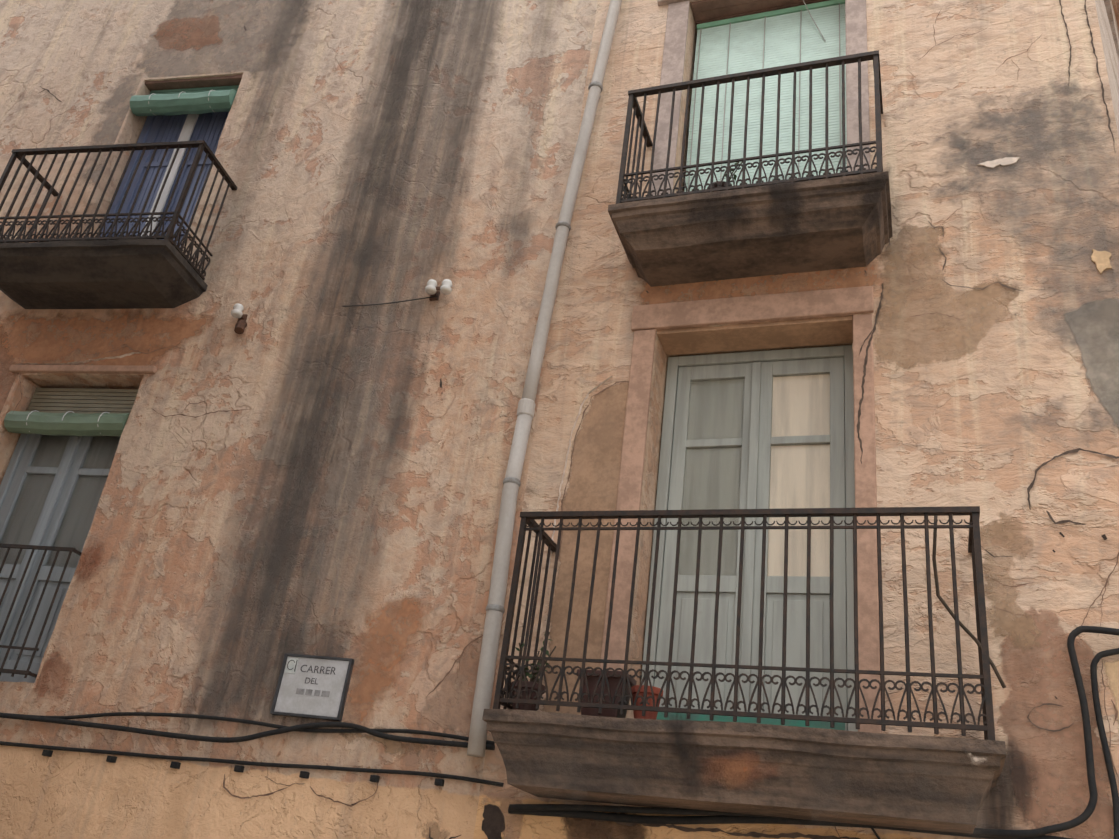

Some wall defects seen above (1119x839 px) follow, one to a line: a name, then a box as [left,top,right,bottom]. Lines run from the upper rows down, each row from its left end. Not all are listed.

crack [996,0,1119,154]
damp [975,110,1053,173]
peeling [640,221,1023,369]
damp [1049,227,1119,313]
peeling [0,344,22,414]
damp [200,0,484,716]
crack [857,284,883,464]
peeling [980,513,1023,557]
crack [1081,552,1119,635]
peeling [986,573,1119,839]
damp [563,812,646,839]